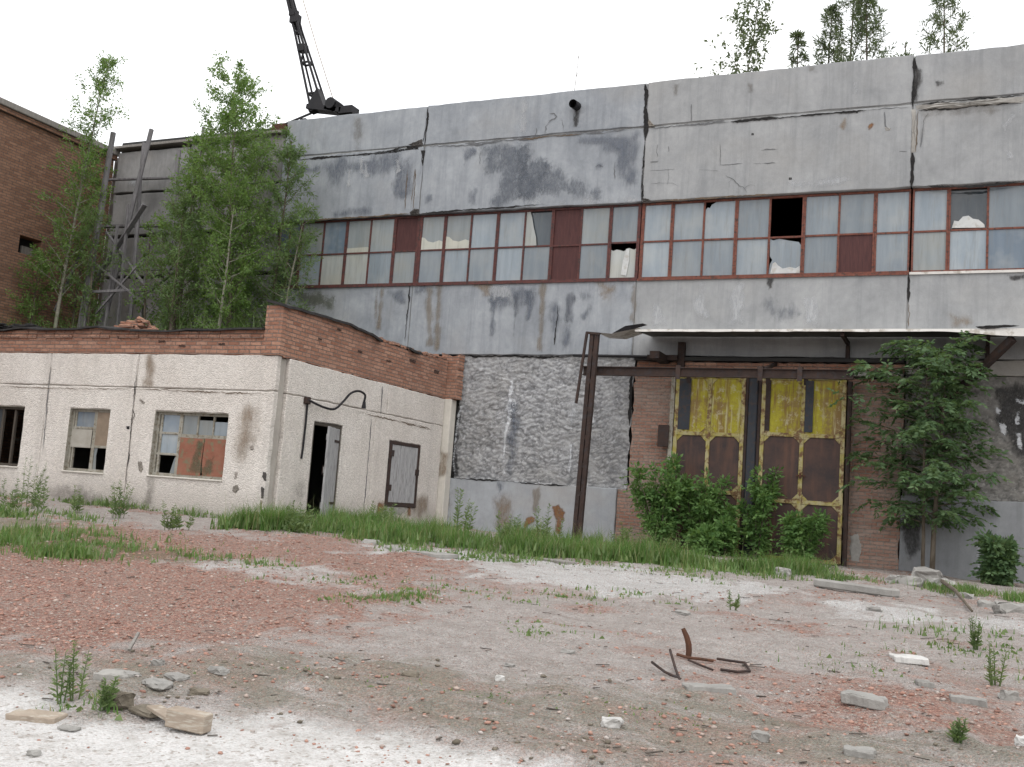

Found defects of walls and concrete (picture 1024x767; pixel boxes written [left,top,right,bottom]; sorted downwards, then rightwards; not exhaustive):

crack [299,58,918,208]
water stain [294,155,410,197]
water stain [490,287,533,331]
water stain [553,296,575,345]
crack [904,274,912,326]
water stain [240,409,252,453]
peeling [995,385,1024,456]
corrosion [552,505,565,534]